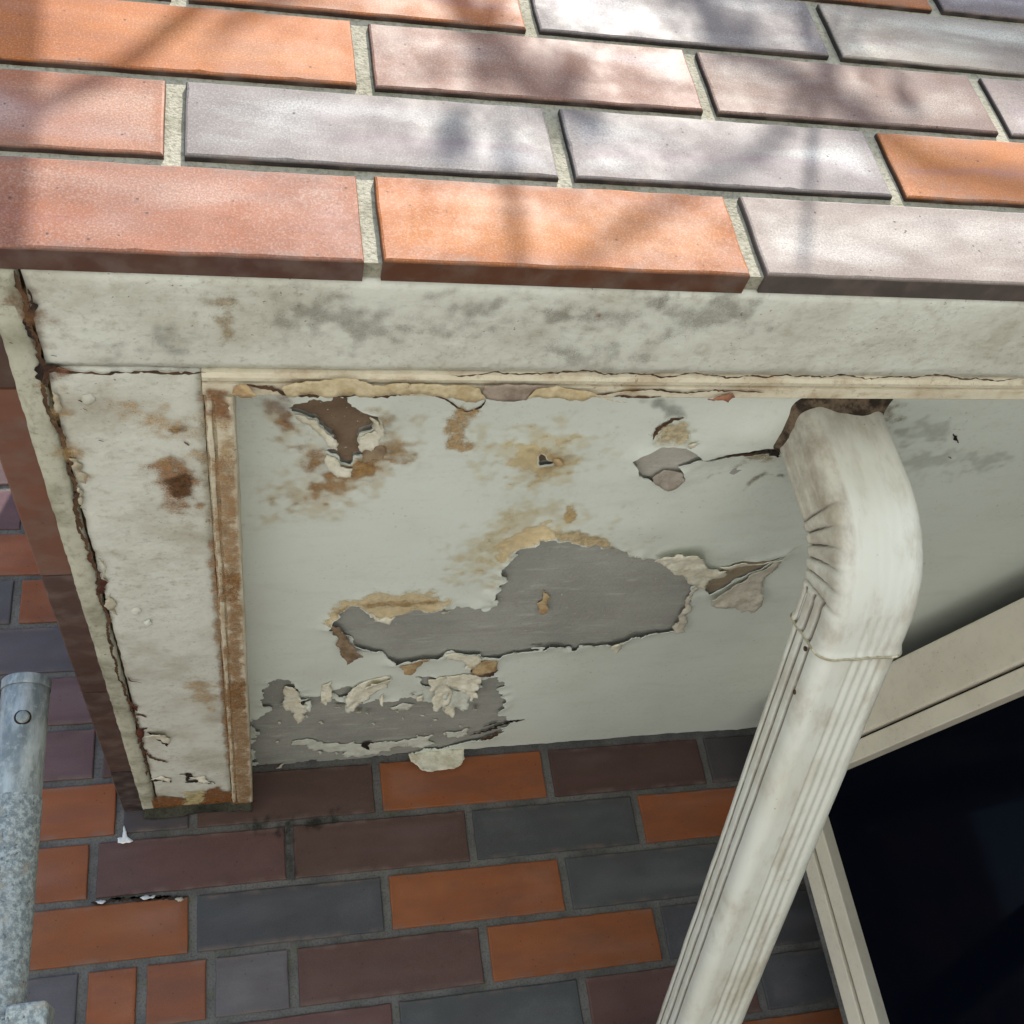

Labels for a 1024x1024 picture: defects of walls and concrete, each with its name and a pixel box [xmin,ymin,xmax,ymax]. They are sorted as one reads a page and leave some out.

rust [147,416,185,433]
rust [200,390,230,430]
peeling [230,377,661,483]
peeling [635,442,699,491]
spalling [708,393,735,402]
crack [435,370,1017,445]
crack [715,449,780,460]
crack [14,271,216,784]
leakage [494,506,613,562]
rust [148,442,255,808]
peeling [250,540,802,772]